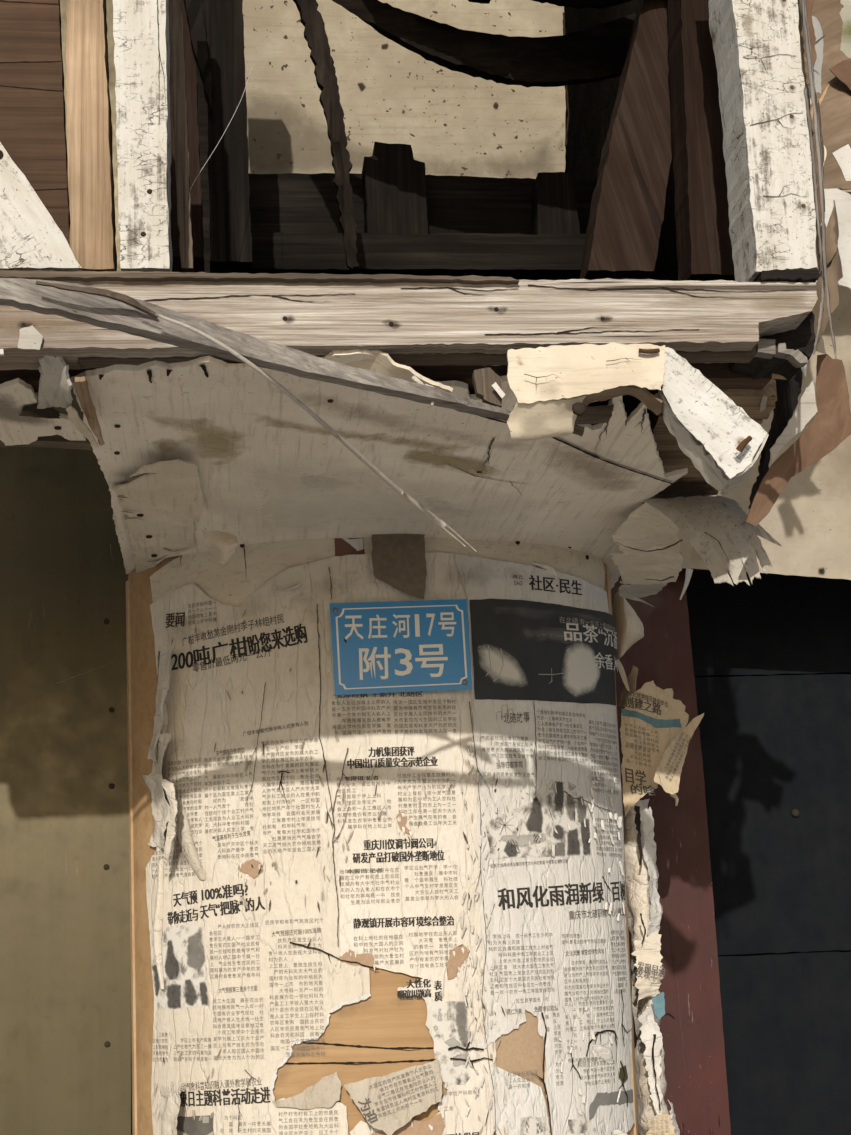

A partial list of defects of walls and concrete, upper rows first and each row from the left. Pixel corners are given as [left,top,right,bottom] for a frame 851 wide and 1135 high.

peeling [799,0,817,85]
peeling [810,83,843,347]
spalling [18,404,61,419]
spalling [75,376,105,446]
crack [285,701,496,1135]
peeling [495,1010,546,1094]